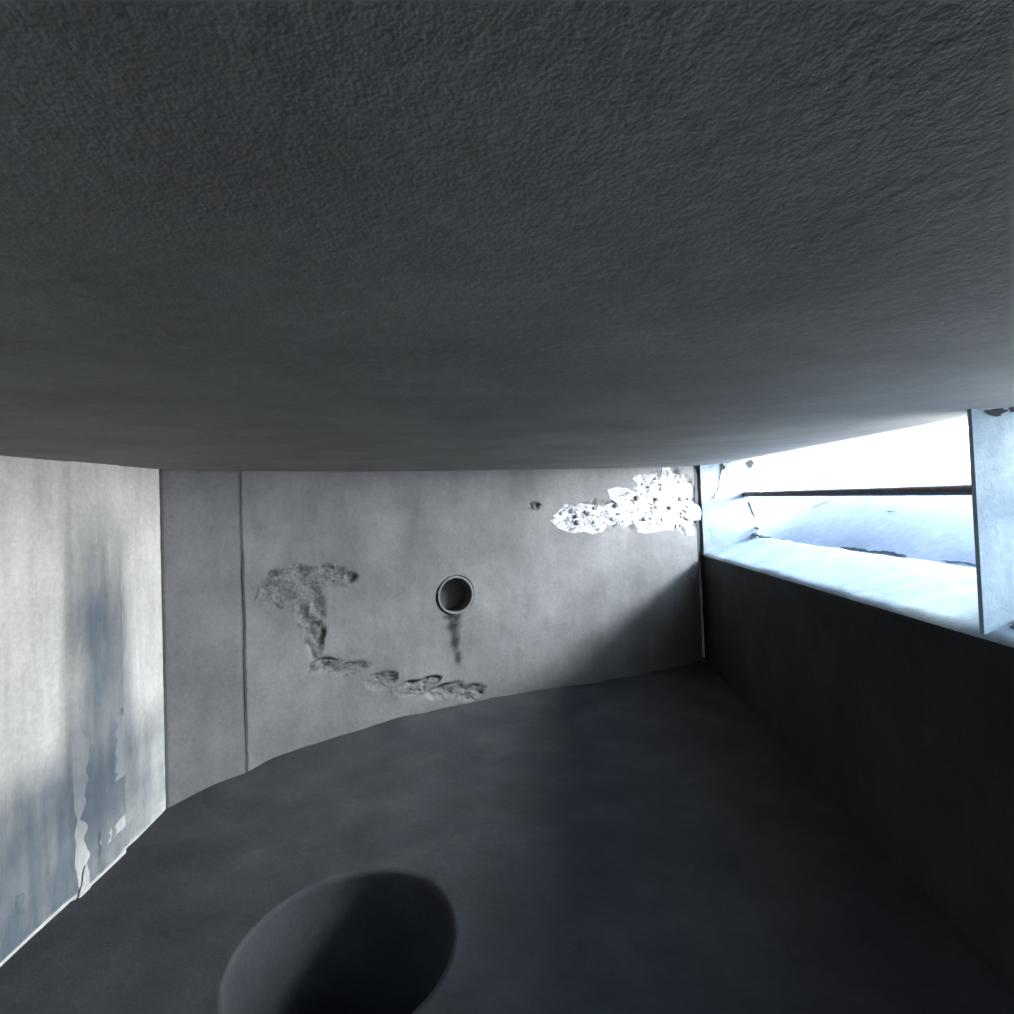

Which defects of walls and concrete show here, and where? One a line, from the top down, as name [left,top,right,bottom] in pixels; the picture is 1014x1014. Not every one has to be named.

spalling [550,467,701,536]